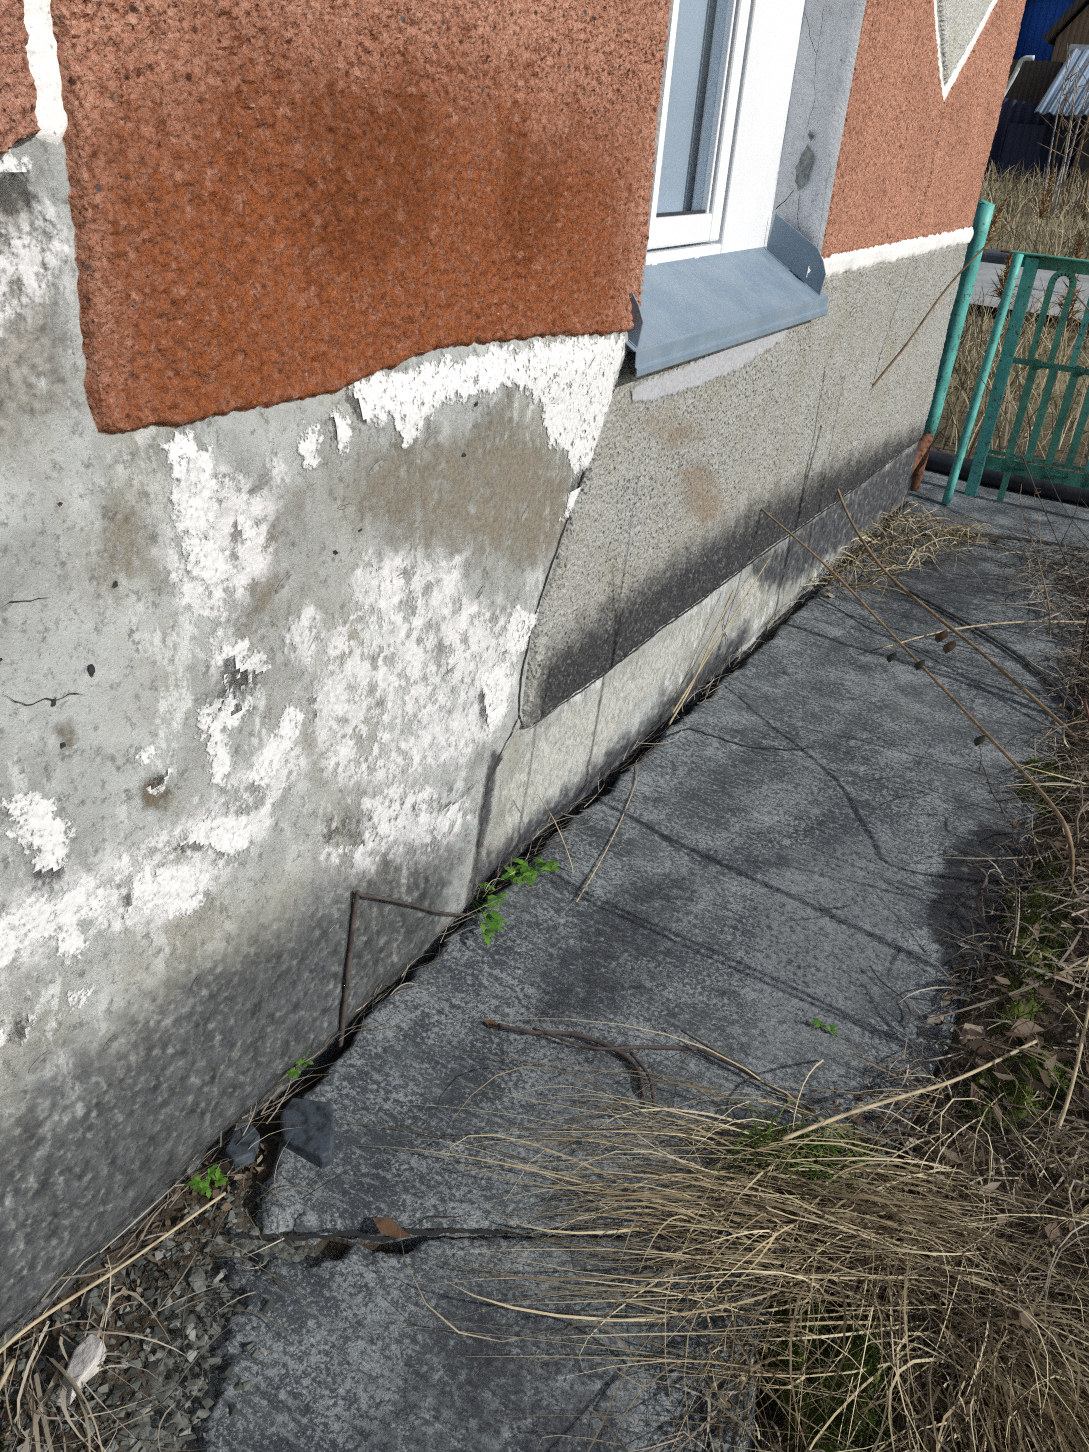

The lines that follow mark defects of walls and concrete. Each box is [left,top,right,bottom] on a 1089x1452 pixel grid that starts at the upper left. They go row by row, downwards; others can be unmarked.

crack [805,0,826,146]
spalling [0,149,75,445]
peeling [160,332,625,596]
peeling [429,553,486,637]
peeling [382,604,539,767]
peeling [360,772,451,860]
damp [0,403,923,1354]
damp [929,825,1032,992]
crack [225,1215,526,1243]
damp [392,1353,600,1452]